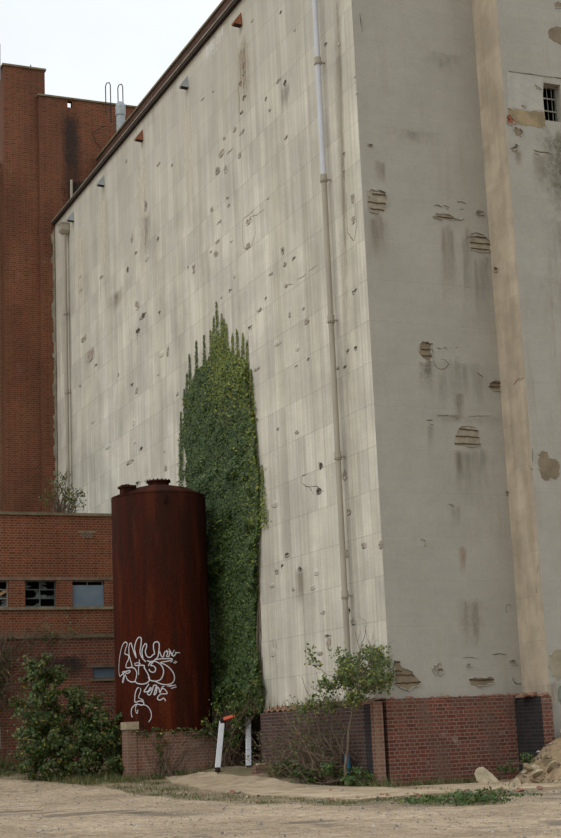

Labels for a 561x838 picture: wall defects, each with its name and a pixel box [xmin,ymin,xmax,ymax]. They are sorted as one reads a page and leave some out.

peeling [548,26,561,45]
peeling [507,105,546,151]
spalling [367,190,388,214]
spalling [469,235,491,253]
spalling [418,340,433,362]
spalling [488,380,501,391]
spalling [455,425,481,447]
peeling [538,451,560,481]
spalling [393,660,422,699]
spalling [469,676,549,698]